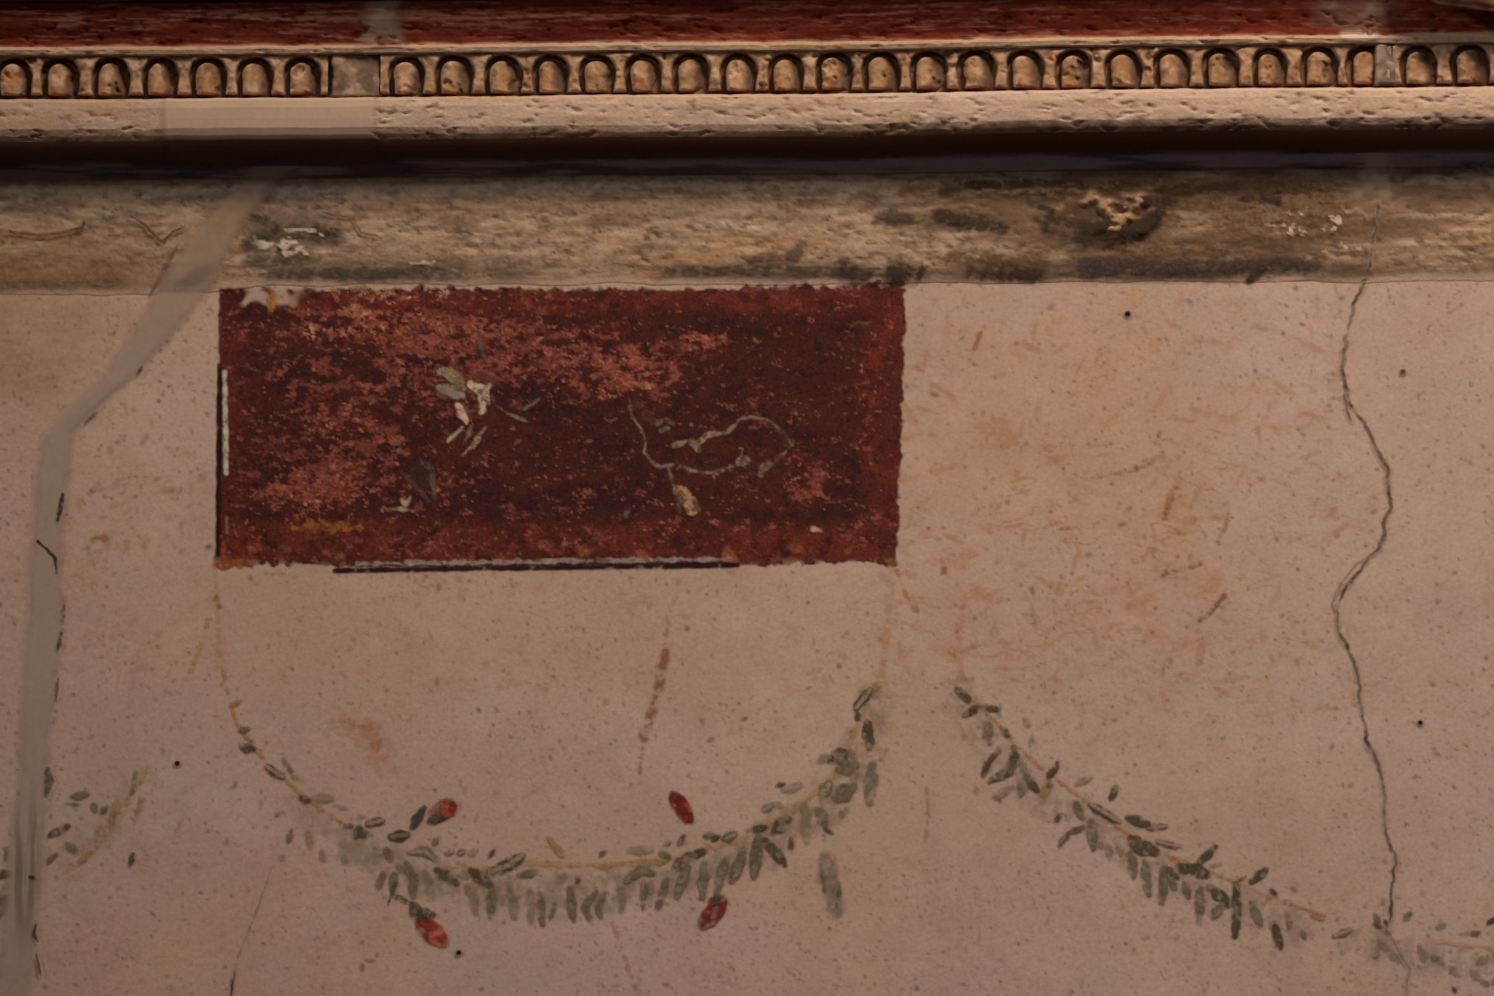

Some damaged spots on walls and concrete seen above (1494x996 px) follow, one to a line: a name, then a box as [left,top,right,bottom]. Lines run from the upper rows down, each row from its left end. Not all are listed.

crack [1333,203,1398,921]